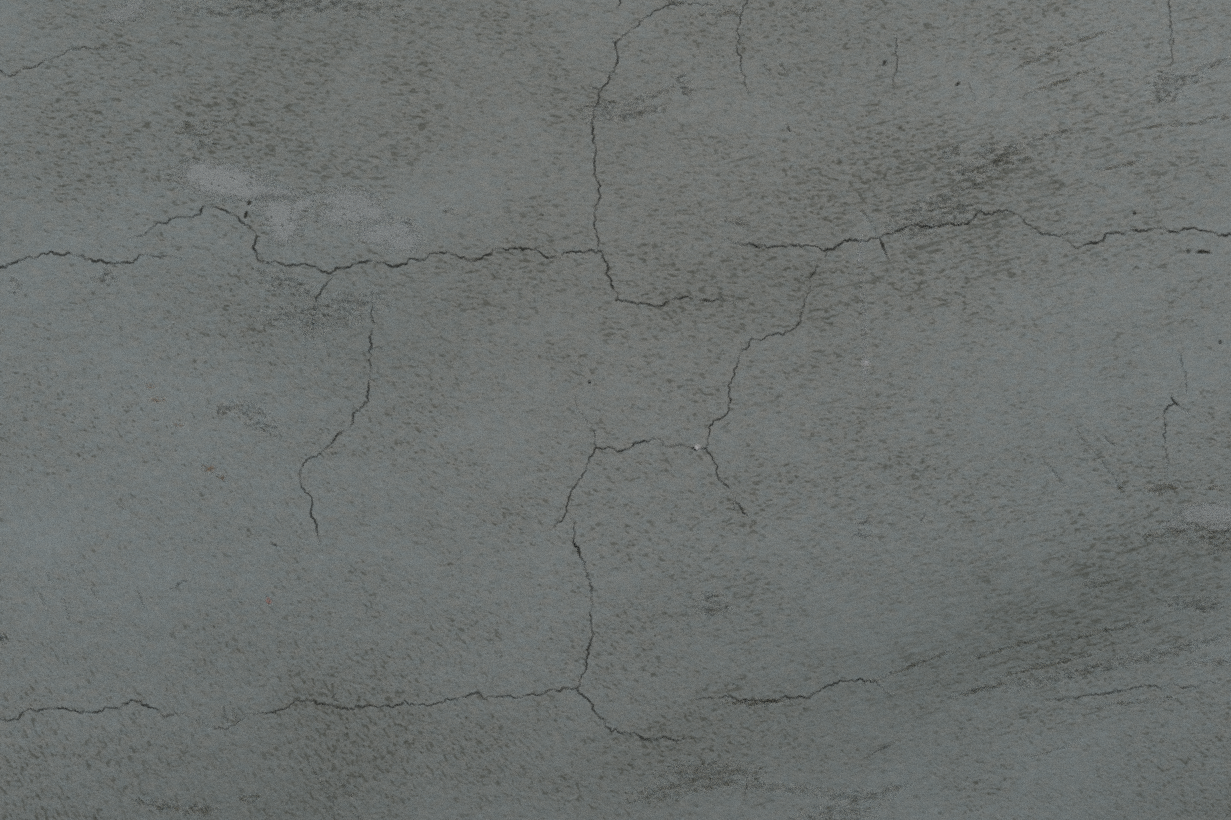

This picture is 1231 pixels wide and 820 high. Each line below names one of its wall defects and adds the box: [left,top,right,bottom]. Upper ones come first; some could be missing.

crack [283,0,715,306]
crack [0,251,139,268]
crack [751,210,1029,273]
crack [1085,227,1231,245]
crack [561,440,647,549]
crack [19,700,156,718]
crack [509,645,647,740]